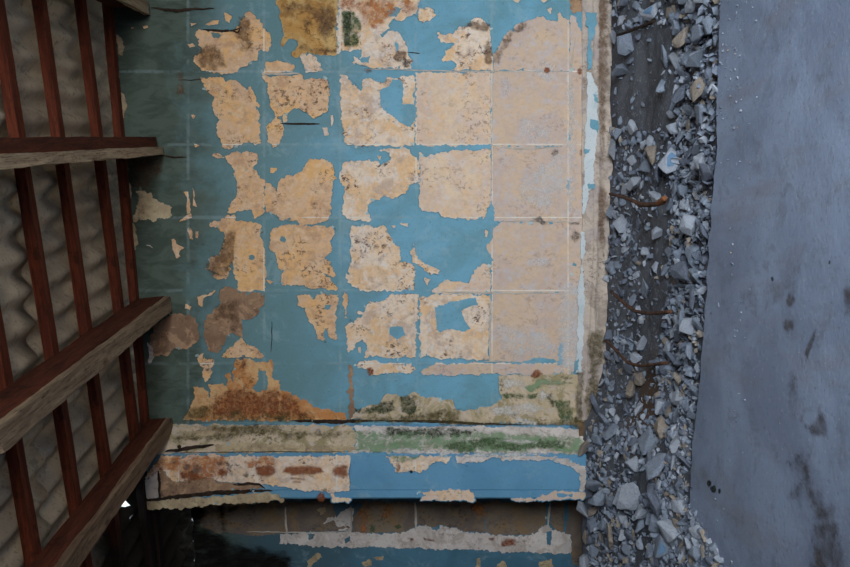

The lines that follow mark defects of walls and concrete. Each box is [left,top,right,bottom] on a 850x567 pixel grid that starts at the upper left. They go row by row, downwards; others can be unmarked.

crack [151,7,241,33]
damp [287,5,361,46]
crack [280,120,319,128]
peeling [129,0,588,567]
rust [213,389,306,419]
damp [355,333,604,462]
crack [165,444,221,453]
rust [248,456,322,476]
rust [333,466,347,476]